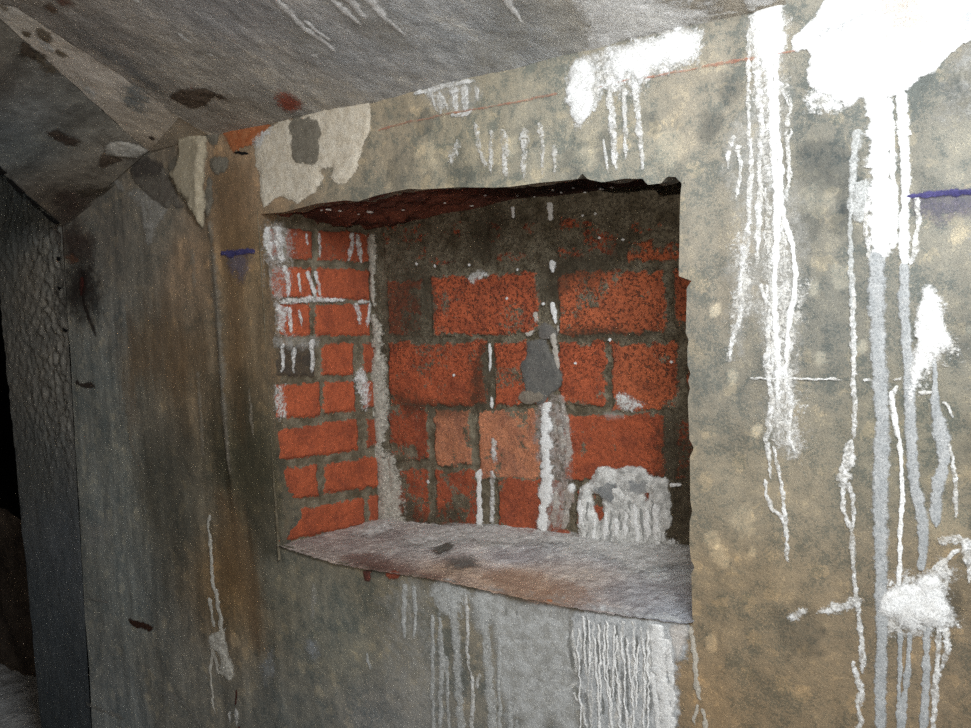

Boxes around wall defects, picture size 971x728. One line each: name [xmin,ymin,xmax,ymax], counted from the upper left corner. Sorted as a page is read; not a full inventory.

damp [565,0,735,169]
damp [264,222,693,572]
damp [711,0,971,728]
damp [207,515,240,728]
damp [401,584,417,639]
damp [429,579,708,728]